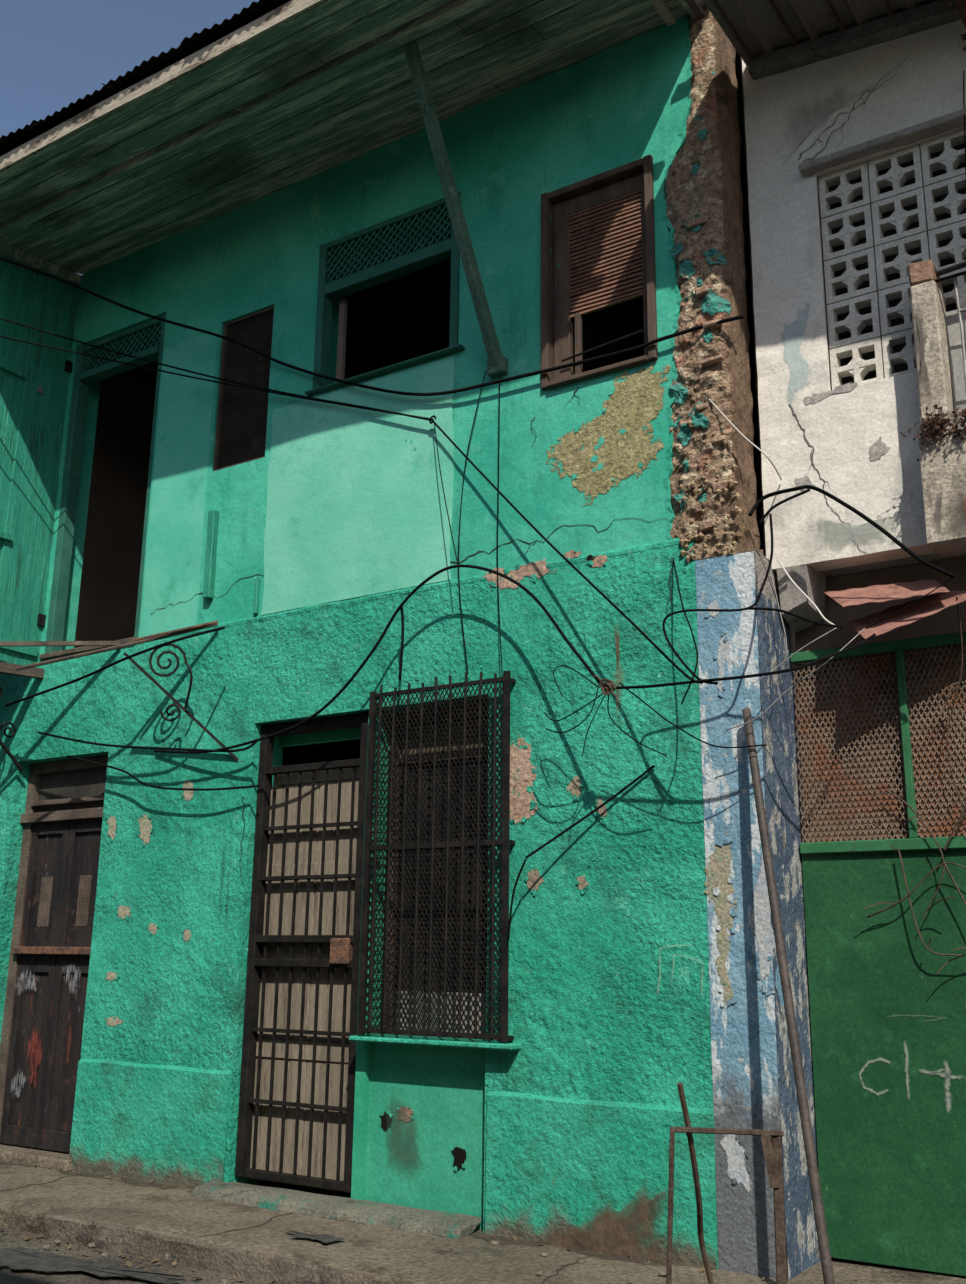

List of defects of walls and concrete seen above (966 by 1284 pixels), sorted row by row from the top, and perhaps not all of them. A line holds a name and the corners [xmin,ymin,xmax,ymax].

crack [798,58,907,162]
spalling [546,5,760,563]
peeling [563,550,608,567]
peeling [483,559,556,589]
peeling [180,779,196,801]
spalling [567,776,585,801]
peeling [107,816,117,842]
peeling [137,813,154,847]
spalling [525,869,544,896]
peeling [116,905,132,920]
peeling [702,830,776,1008]
peeling [720,1134,752,1192]